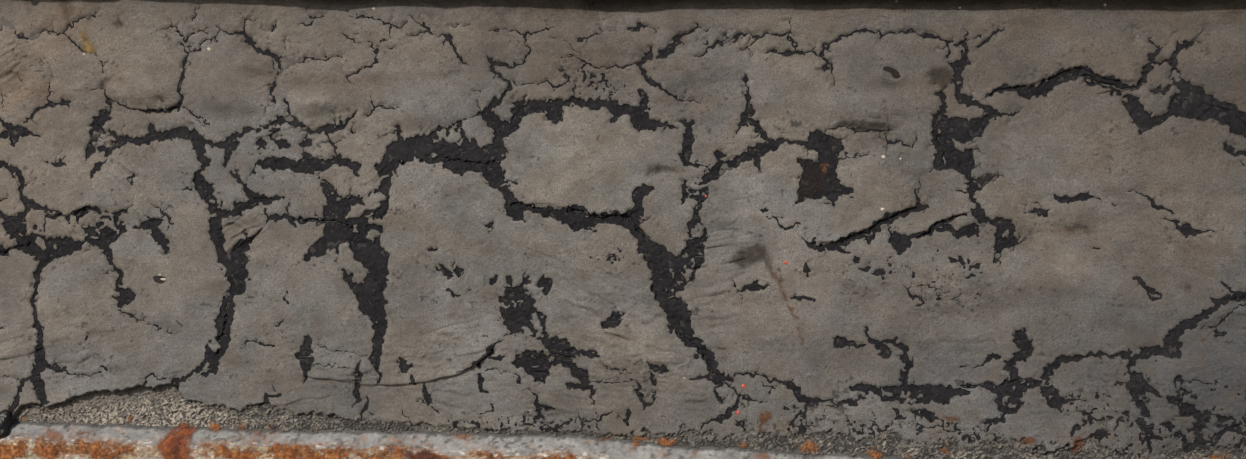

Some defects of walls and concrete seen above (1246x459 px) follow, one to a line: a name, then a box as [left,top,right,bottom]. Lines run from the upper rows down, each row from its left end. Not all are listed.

crack [0,12,106,73]
peeling [23,82,71,123]
crack [0,78,174,421]
peeling [249,139,362,177]
crack [85,11,869,430]
peeling [786,129,854,207]
crack [694,20,1246,266]
peeling [1024,191,1116,217]
spalling [14,245,1246,459]
crack [849,282,1246,453]
corrosion [0,428,135,459]
corrosion [157,423,449,459]